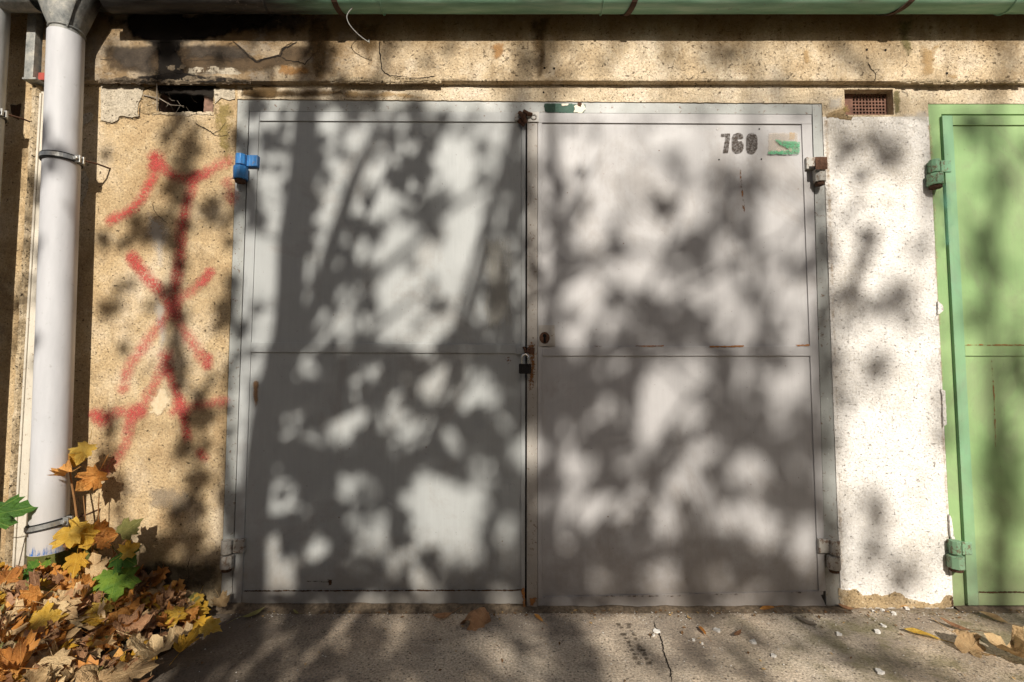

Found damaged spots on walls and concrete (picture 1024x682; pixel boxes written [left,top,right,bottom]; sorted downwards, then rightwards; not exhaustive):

crack [185,41,313,65]
flaking render [83,64,251,127]
peeling [838,588,954,608]
crack [650,623,672,682]